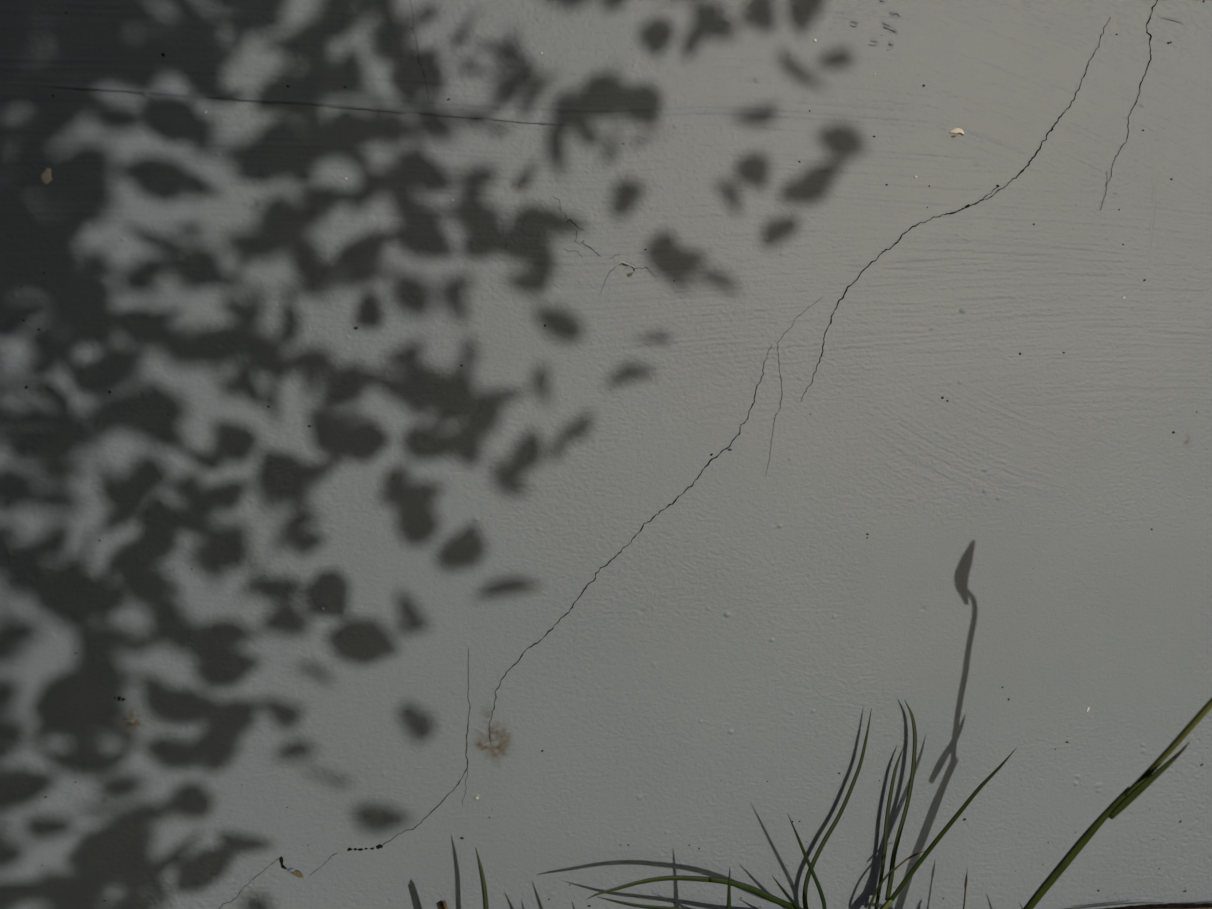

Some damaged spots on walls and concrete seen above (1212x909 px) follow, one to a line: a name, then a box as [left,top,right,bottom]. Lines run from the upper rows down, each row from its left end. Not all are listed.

crack [1100,0,1158,210]
crack [309,19,1110,876]
crack [219,858,279,909]